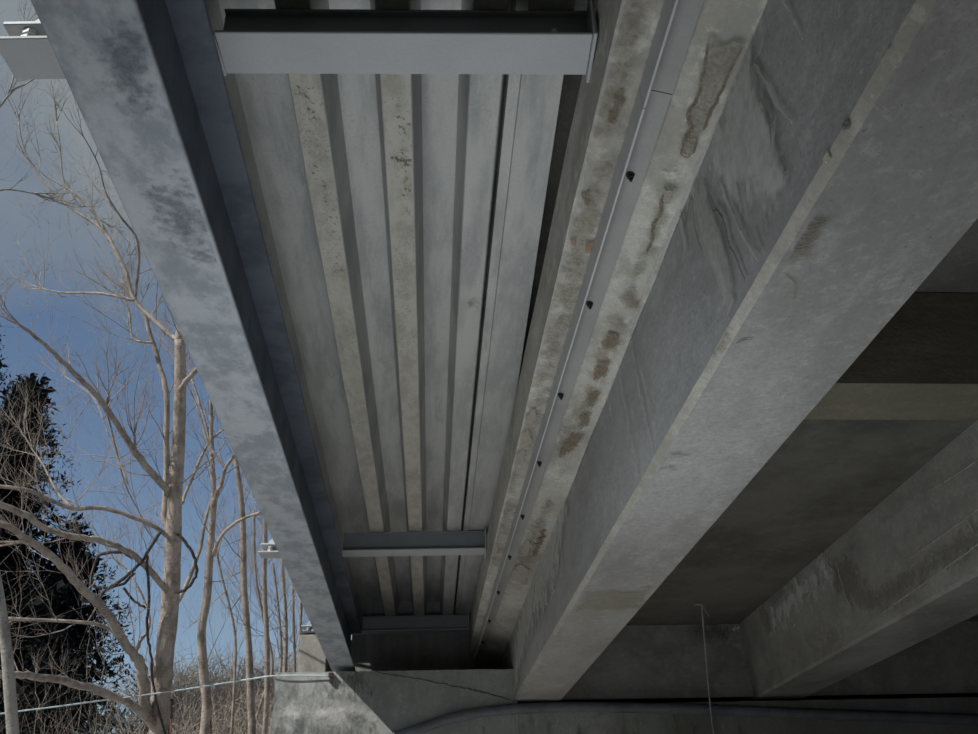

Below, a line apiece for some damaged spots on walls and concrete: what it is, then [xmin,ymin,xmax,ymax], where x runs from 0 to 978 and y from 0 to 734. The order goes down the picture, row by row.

water stain [513,502,567,693]